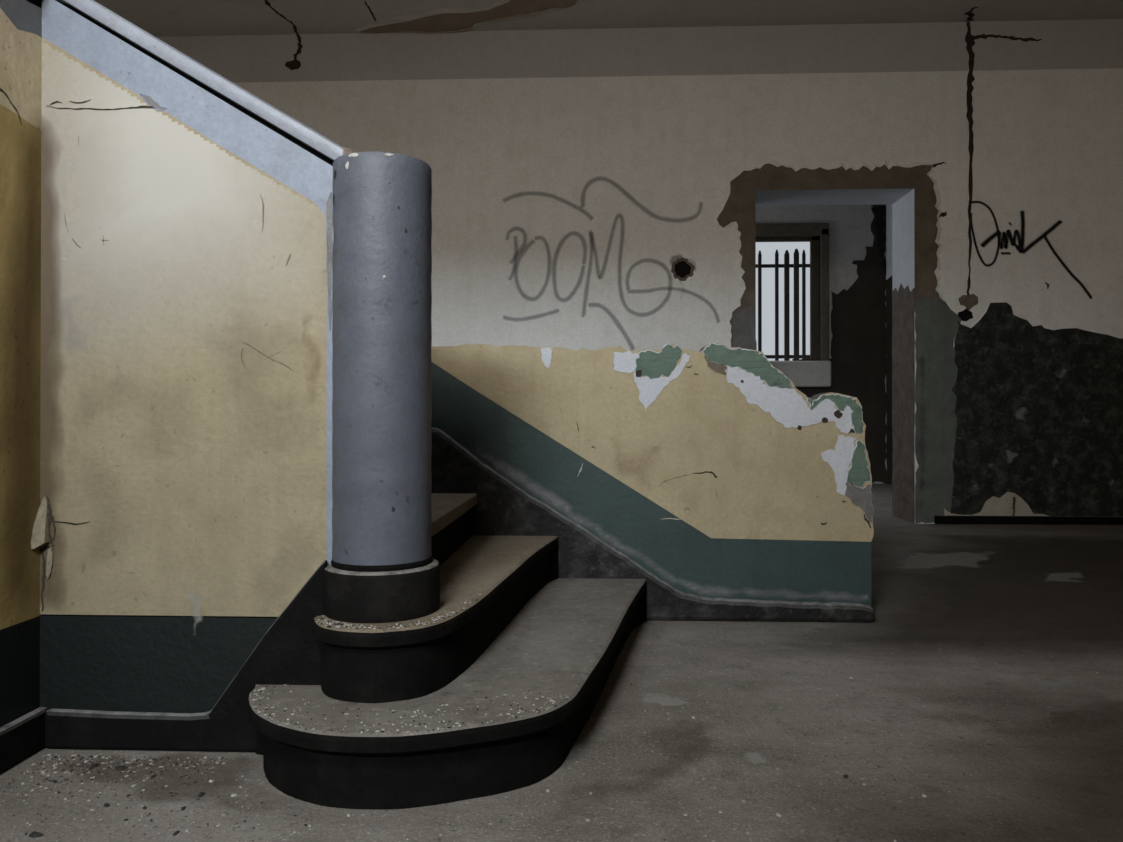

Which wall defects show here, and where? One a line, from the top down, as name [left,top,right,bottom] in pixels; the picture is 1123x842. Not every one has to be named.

crack [264,0,303,70]
peeling [354,0,583,34]
crack [0,88,22,124]
crack [50,99,154,110]
crack [958,7,1042,321]
peeling [613,159,1123,529]